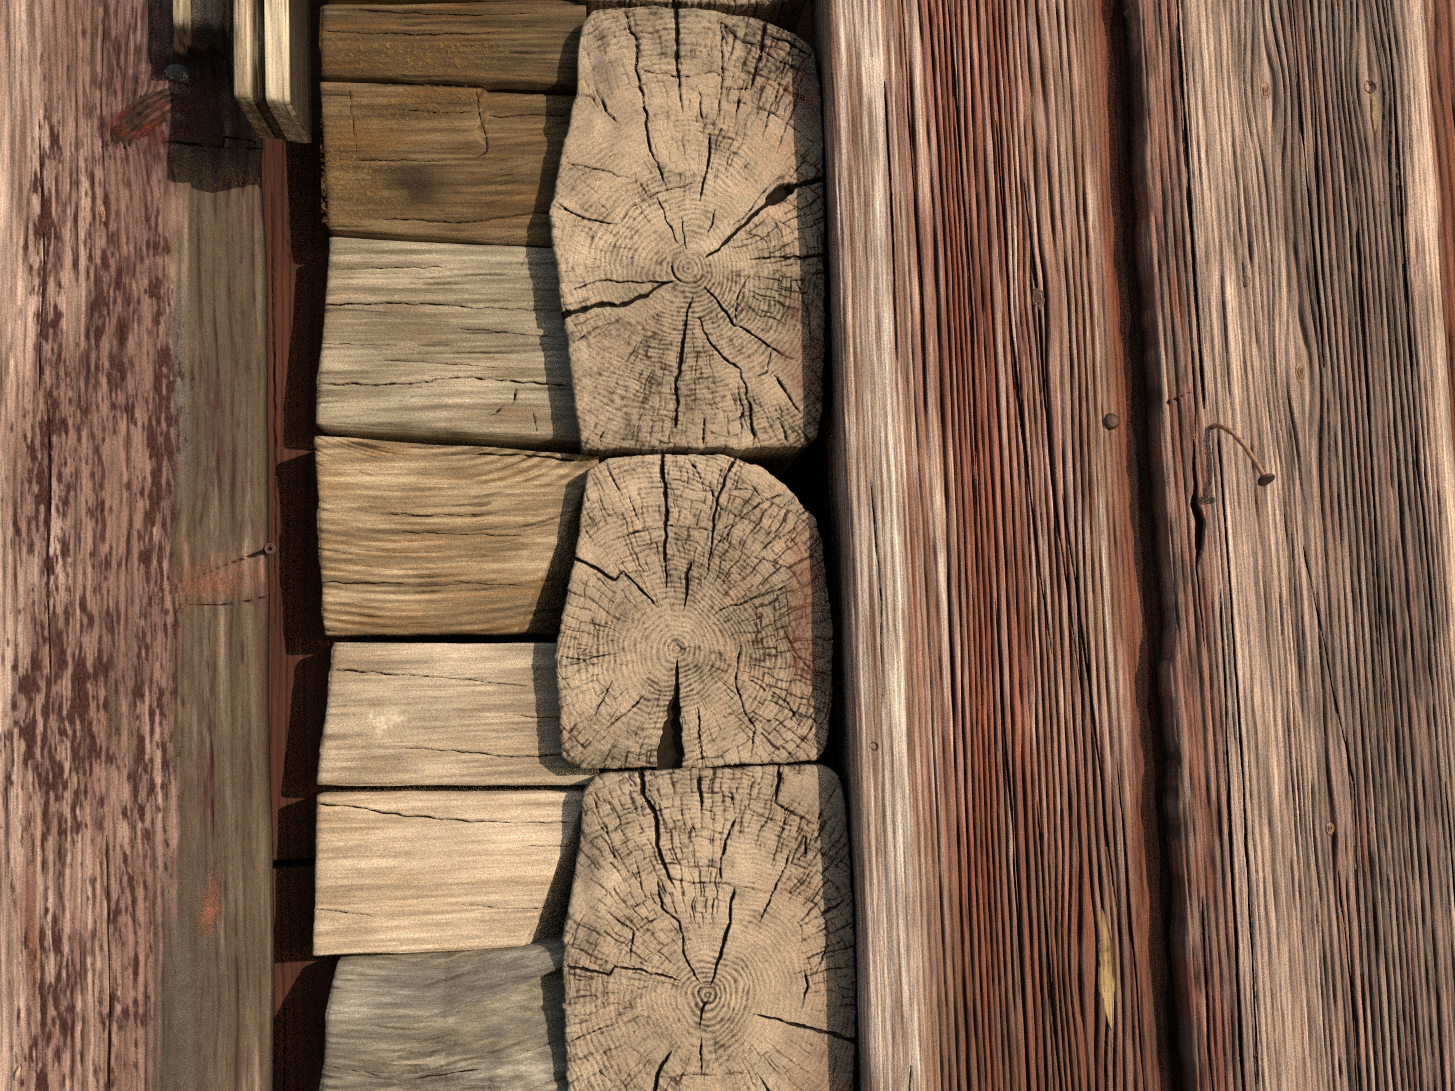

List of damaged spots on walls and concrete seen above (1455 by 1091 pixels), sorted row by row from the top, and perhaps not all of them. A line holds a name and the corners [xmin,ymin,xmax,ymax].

peeling [0,96,194,1091]